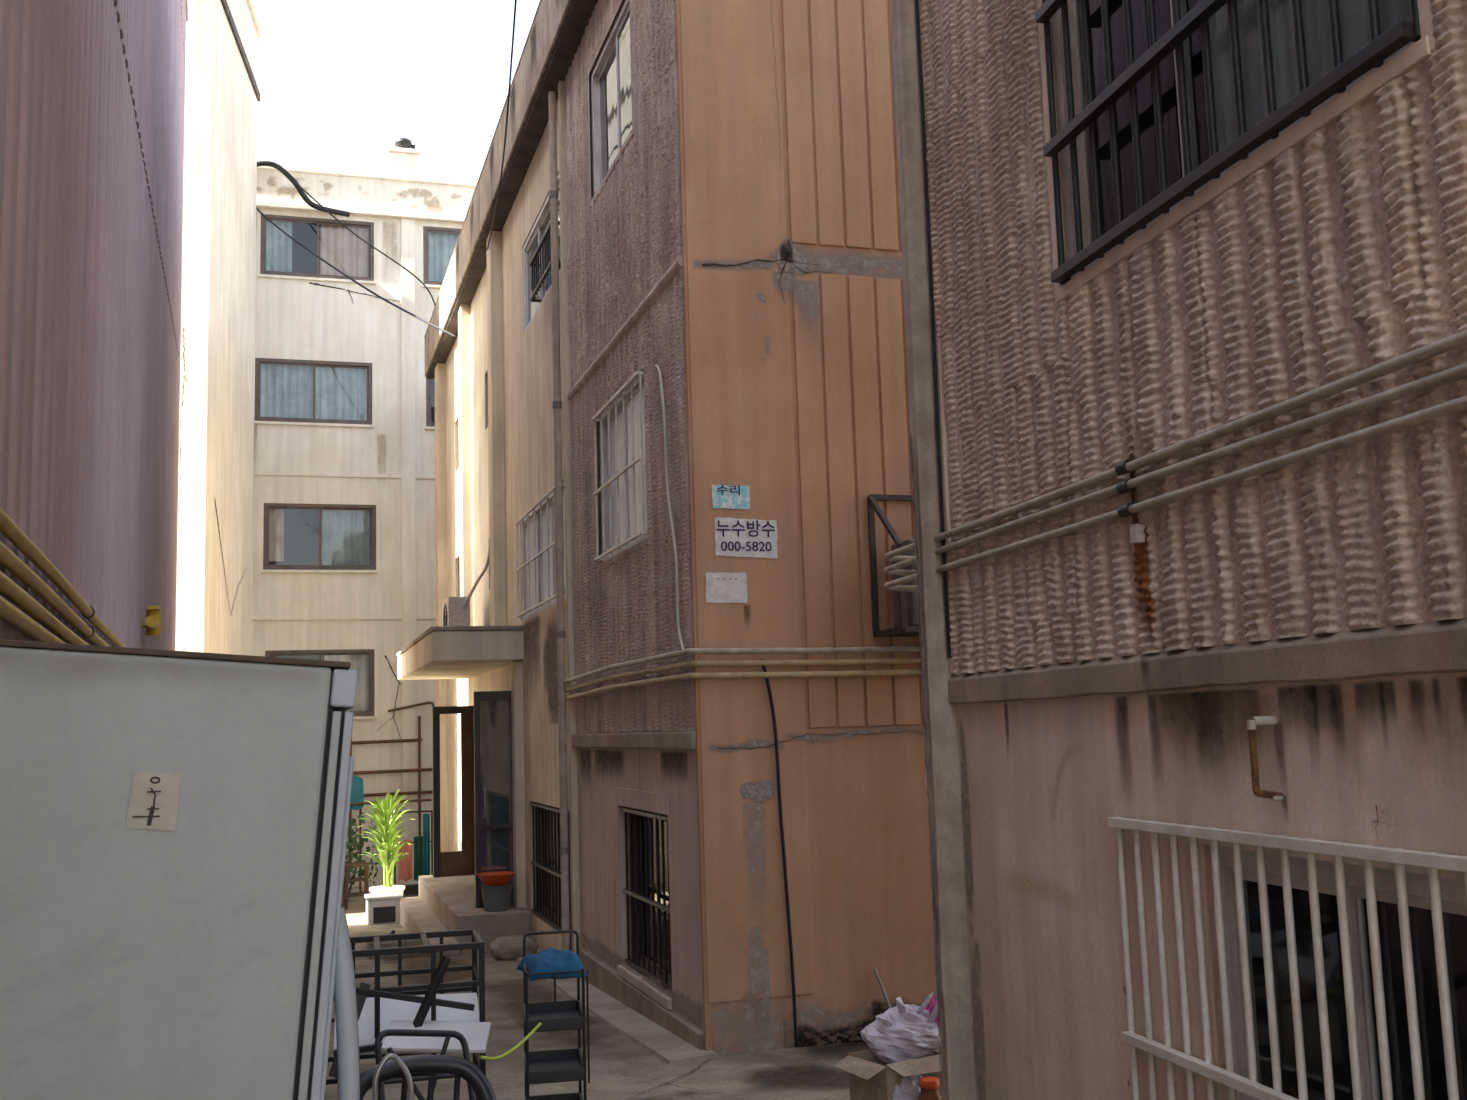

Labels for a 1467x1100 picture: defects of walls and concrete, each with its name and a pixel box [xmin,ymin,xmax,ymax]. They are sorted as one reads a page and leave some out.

rust [1133,527,1157,633]
leakage [1117,697,1126,753]
leakage [1149,690,1255,756]
leakage [1279,680,1438,729]
peeling [740,780,774,802]